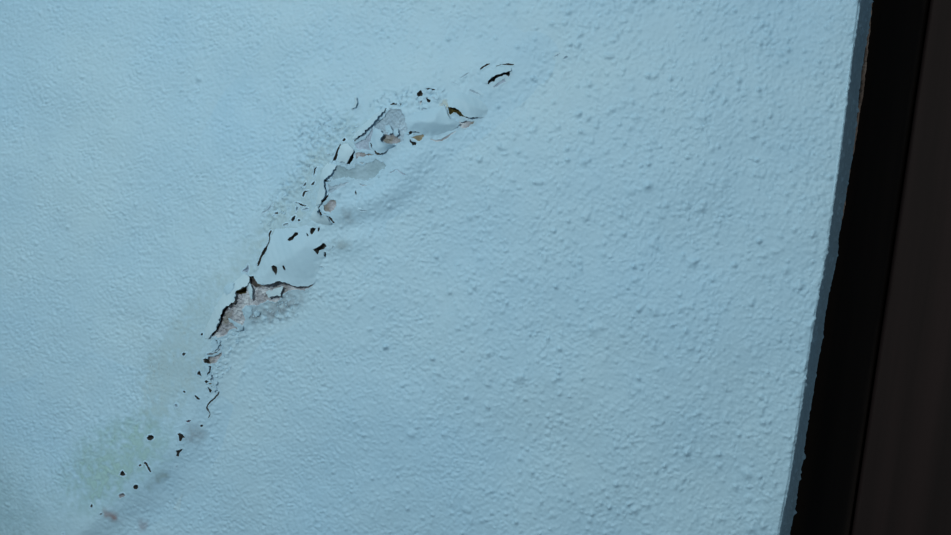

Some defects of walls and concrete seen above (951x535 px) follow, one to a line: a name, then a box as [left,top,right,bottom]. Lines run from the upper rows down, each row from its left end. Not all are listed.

peeling [327,61,515,188]
flaking render [199,274,315,340]